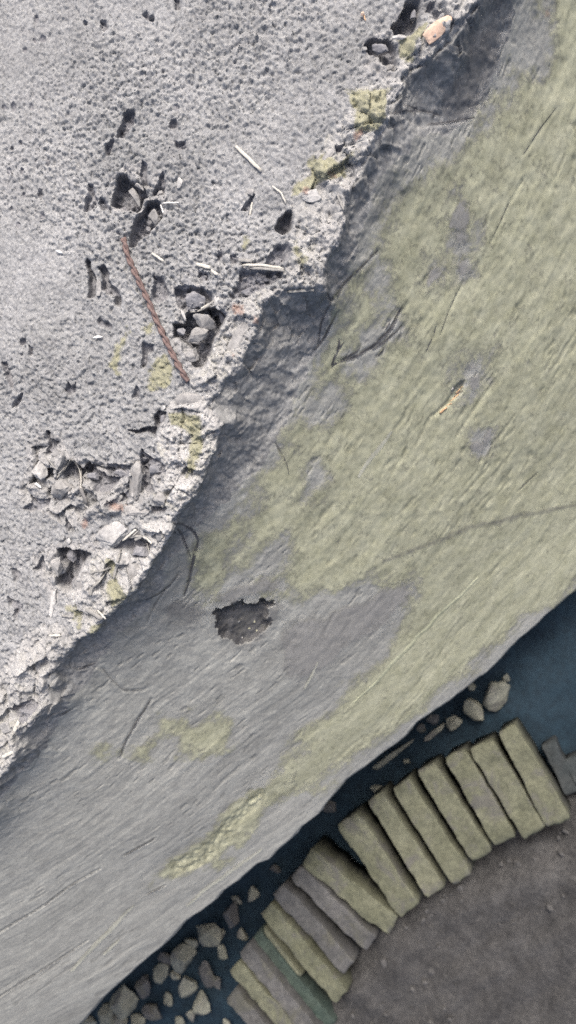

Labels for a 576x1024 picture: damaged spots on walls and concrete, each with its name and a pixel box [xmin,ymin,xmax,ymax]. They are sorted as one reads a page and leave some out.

crack [314,250,402,368]
spalling [0,0,516,799]
crack [141,522,199,617]